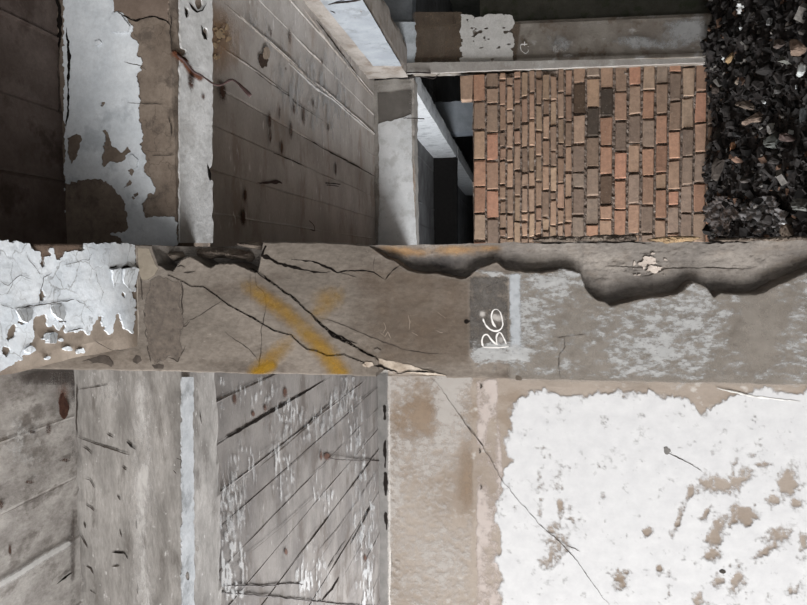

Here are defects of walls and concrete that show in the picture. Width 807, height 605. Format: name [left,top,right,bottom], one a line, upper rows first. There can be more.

corrosion [172,51,252,100]
peeling [459,14,515,62]
peeling [0,0,264,371]
crack [219,376,332,443]
crack [168,246,435,401]
crack [231,387,388,599]
crack [438,385,601,595]
peeling [363,114,807,605]